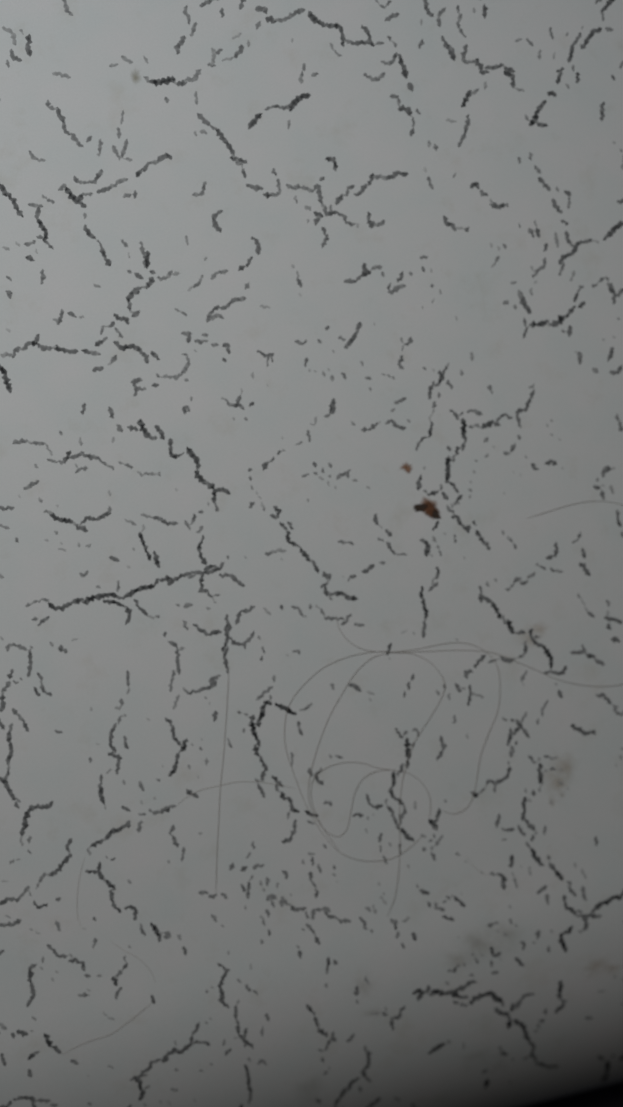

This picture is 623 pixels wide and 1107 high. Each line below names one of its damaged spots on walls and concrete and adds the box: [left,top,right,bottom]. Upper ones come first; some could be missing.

crack [0,100,172,266]
crack [143,0,415,248]
crack [423,0,615,147]
crack [517,152,623,339]
crack [0,241,255,776]
crack [265,505,440,638]
rust [414,499,440,519]
crack [361,363,535,550]
crack [463,542,605,706]
crack [0,643,179,942]
crack [248,686,300,844]
crack [470,712,623,952]